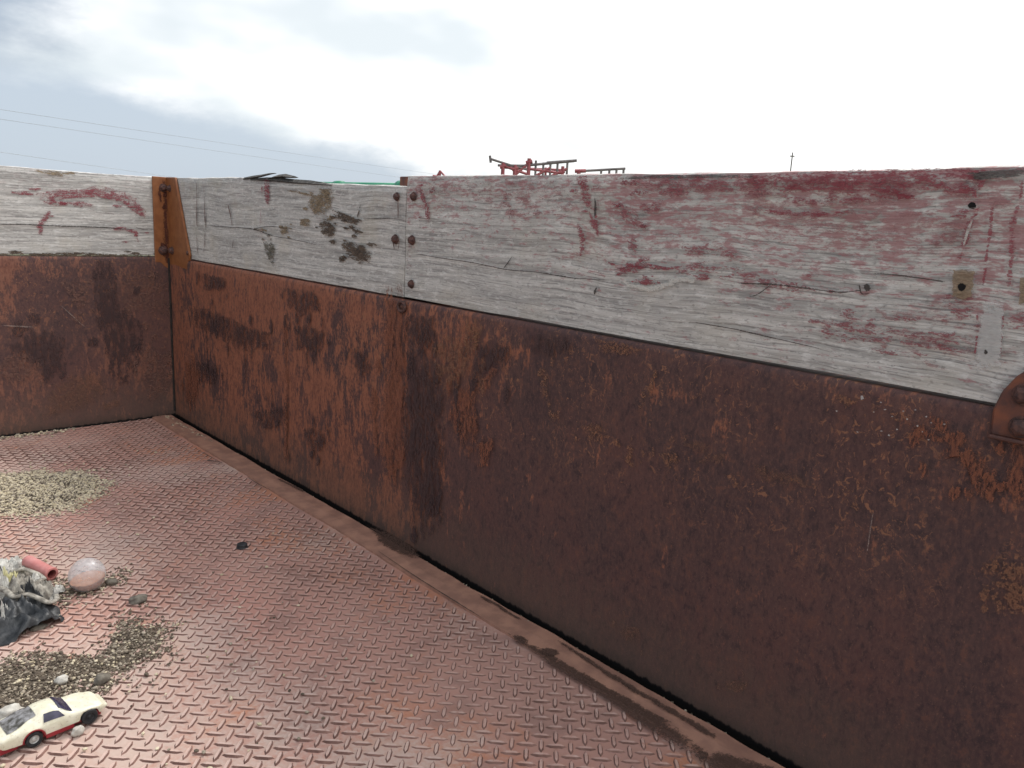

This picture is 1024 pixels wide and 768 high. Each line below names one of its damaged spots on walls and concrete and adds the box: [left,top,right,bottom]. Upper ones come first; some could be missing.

peeling [12,188,93,217]
peeling [113,199,146,217]
peeling [765,190,915,218]
peeling [608,238,690,283]
crack [740,273,943,297]
rust [890,411,1024,512]
rust [980,553,1024,619]